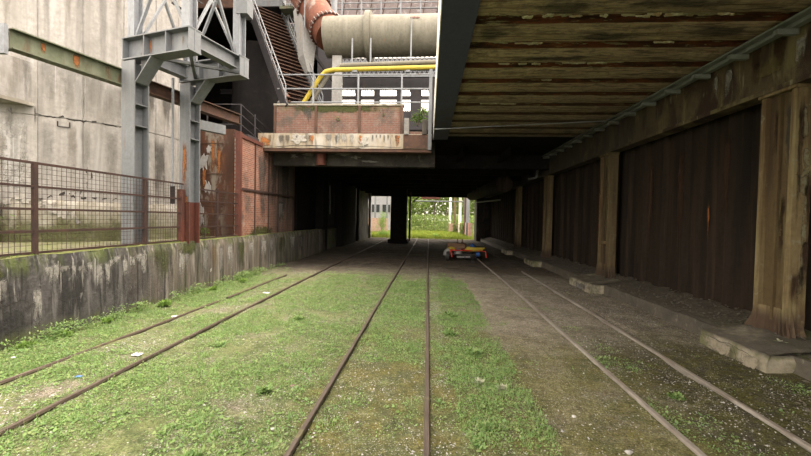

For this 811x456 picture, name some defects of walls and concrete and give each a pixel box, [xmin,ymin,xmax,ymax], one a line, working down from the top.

damp [45,251,168,282]
damp [203,236,303,271]
damp [34,291,42,313]